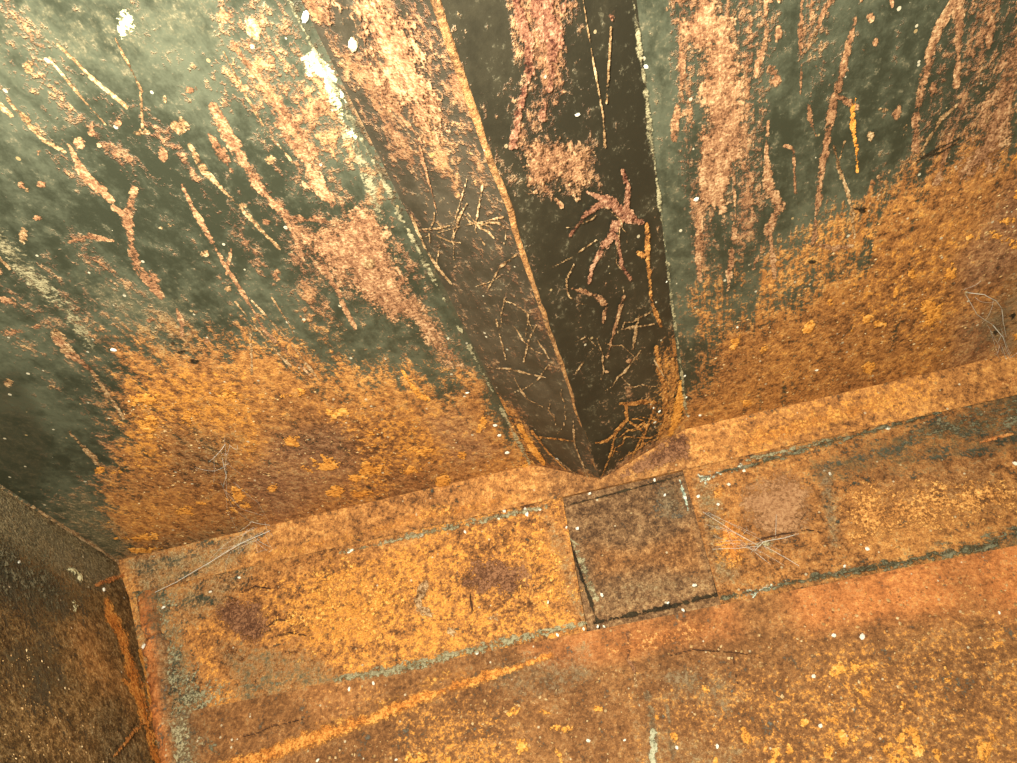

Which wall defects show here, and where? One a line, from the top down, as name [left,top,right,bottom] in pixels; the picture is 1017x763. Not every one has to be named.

rust [230,40,336,207]
rust [170,100,464,378]
peeling [301,51,381,222]
rust [323,0,451,215]
rust [508,0,662,363]
peeling [670,0,748,291]
rust [752,120,786,279]
peeling [932,27,1017,186]
peeling [985,6,996,49]
rust [595,345,685,477]
rust [104,598,162,763]
rust [889,726,925,763]